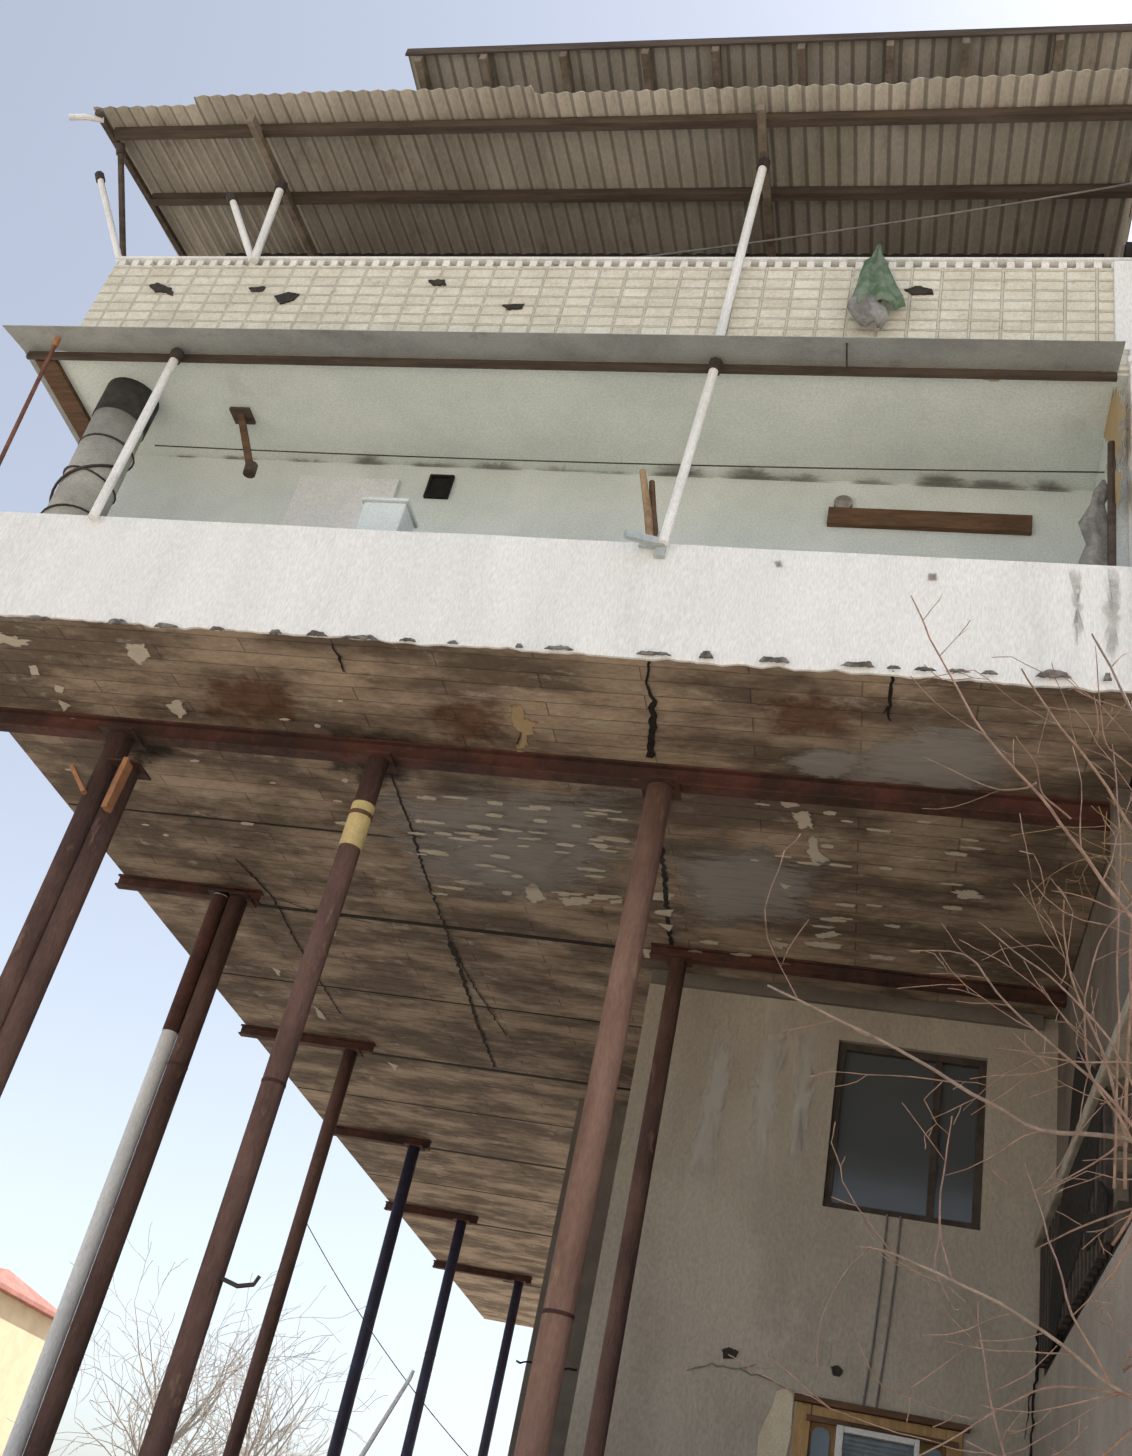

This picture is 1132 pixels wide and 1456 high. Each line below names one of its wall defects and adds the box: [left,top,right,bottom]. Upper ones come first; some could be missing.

spalling [149,282,173,296]
spalling [249,286,300,304]
crack [645,661,657,758]
crack [883,671,895,721]
spalling [841,661,998,675]
spalling [1035,669,1071,679]
flaking render [407,796,630,906]
flaking render [750,802,891,868]
crack [391,774,507,1067]
crack [660,847,674,945]
crack [1024,1048,1108,1456]
crack [687,1362,786,1389]